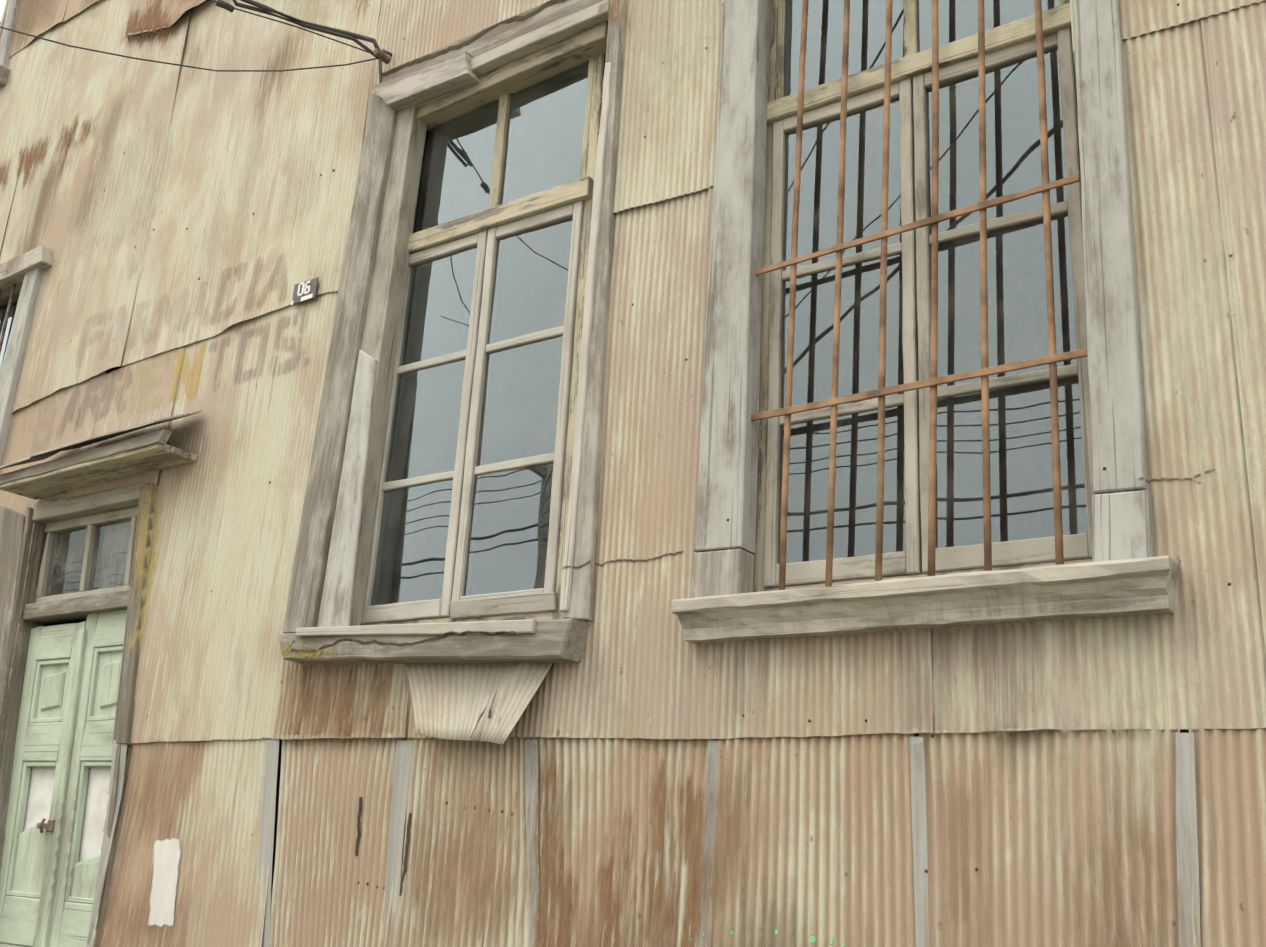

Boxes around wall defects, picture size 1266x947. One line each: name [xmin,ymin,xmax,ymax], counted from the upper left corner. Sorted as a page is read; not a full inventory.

corrosion [125,0,176,45]
corrosion [0,115,90,187]
crack [563,551,683,568]
corrosion [535,762,571,947]
corrosion [600,772,706,947]